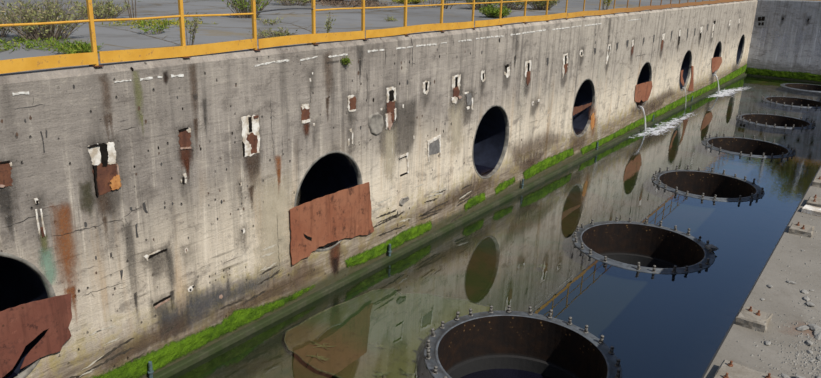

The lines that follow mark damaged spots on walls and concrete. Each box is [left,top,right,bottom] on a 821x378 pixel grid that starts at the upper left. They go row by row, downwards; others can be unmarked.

corrosion [181,149,191,173]
leakage [248,159,258,194]
crack [53,208,139,236]
corrosion [57,206,75,304]
leakage [112,179,312,362]
corrosion [330,244,340,272]